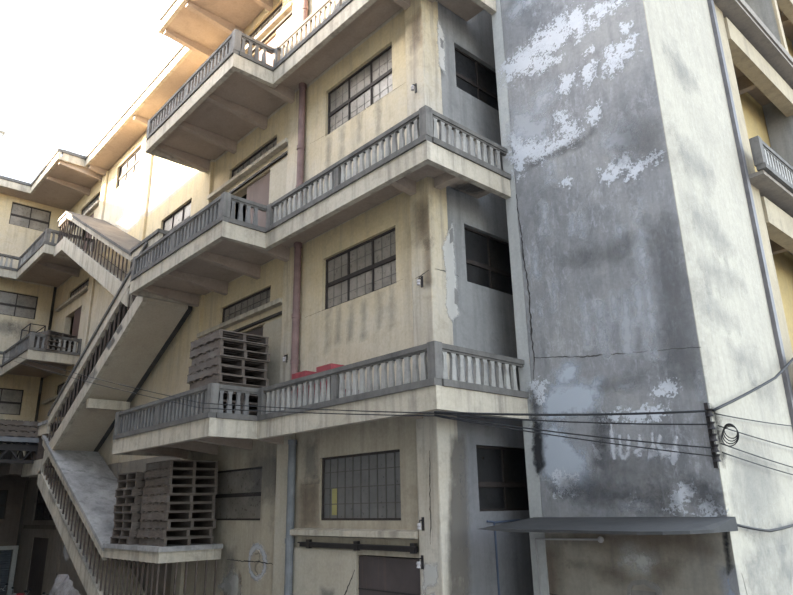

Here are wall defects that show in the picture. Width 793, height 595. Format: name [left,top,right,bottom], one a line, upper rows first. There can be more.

peeling [498,0,643,189]
peeling [596,125,664,188]
peeling [442,225,459,320]
crack [516,194,700,378]
leakage [531,395,545,473]
peeling [422,564,438,595]